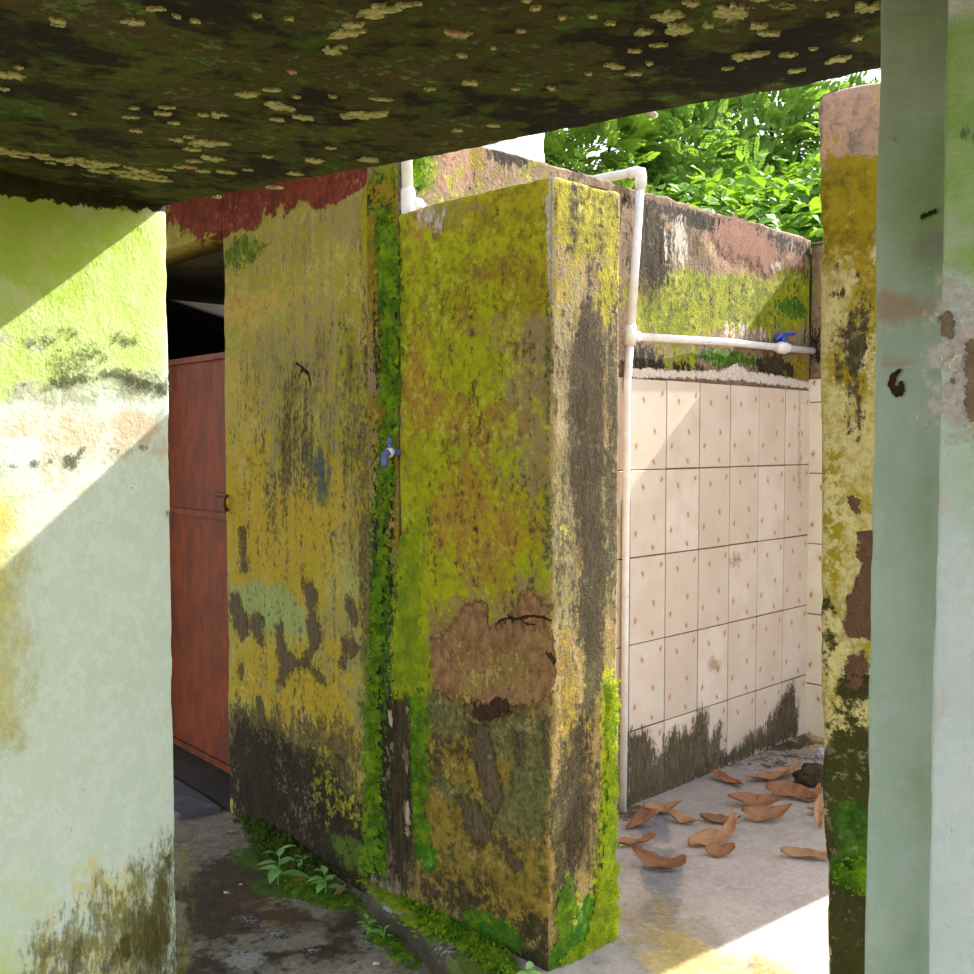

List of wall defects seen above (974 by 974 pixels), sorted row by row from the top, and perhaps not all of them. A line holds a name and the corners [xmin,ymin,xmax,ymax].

water stain [22,328,171,399]
peeling [887,369,905,397]
peeling [924,278,974,441]
water stain [564,297,619,656]
peeling [846,495,865,514]
peeling [841,530,873,692]
flaking render [427,585,557,873]
water stain [627,678,800,807]
water stain [24,834,194,974]